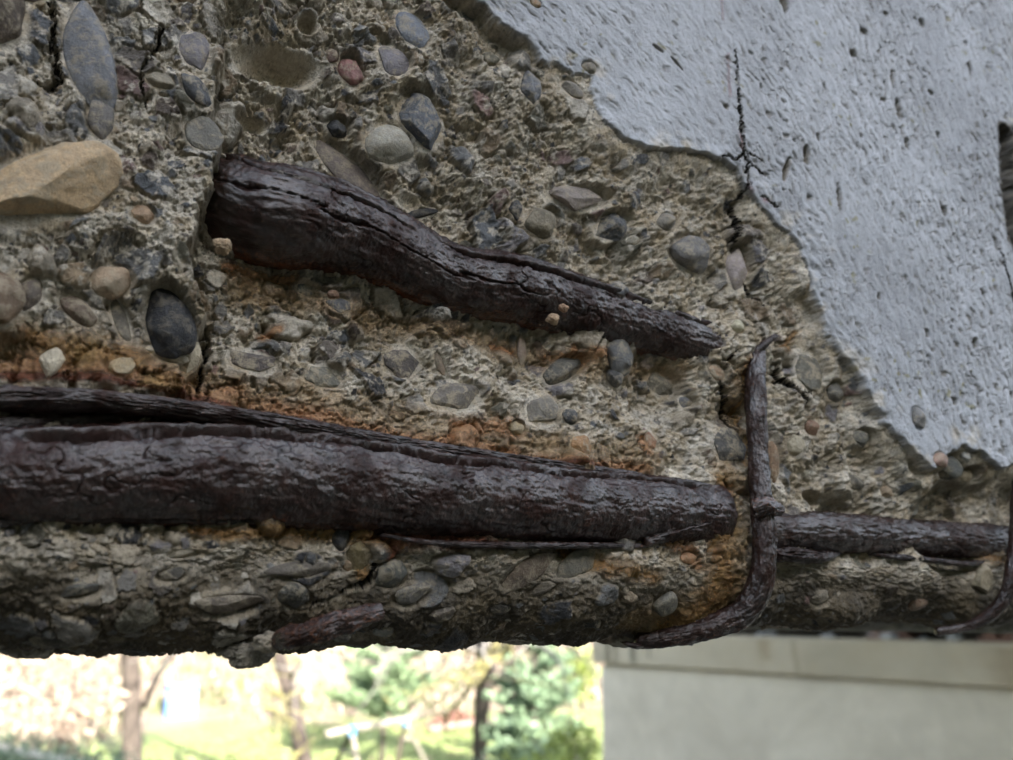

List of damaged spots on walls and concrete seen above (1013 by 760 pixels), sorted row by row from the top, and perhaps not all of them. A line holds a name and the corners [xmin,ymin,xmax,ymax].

crack [722,50,779,253]
spalling [0,518,718,659]
corrosion [0,325,738,630]
spalling [0,0,771,613]
corrosion [204,153,739,366]
corrosion [751,496,1009,567]
spalling [748,547,1013,641]
spalling [764,219,1013,526]